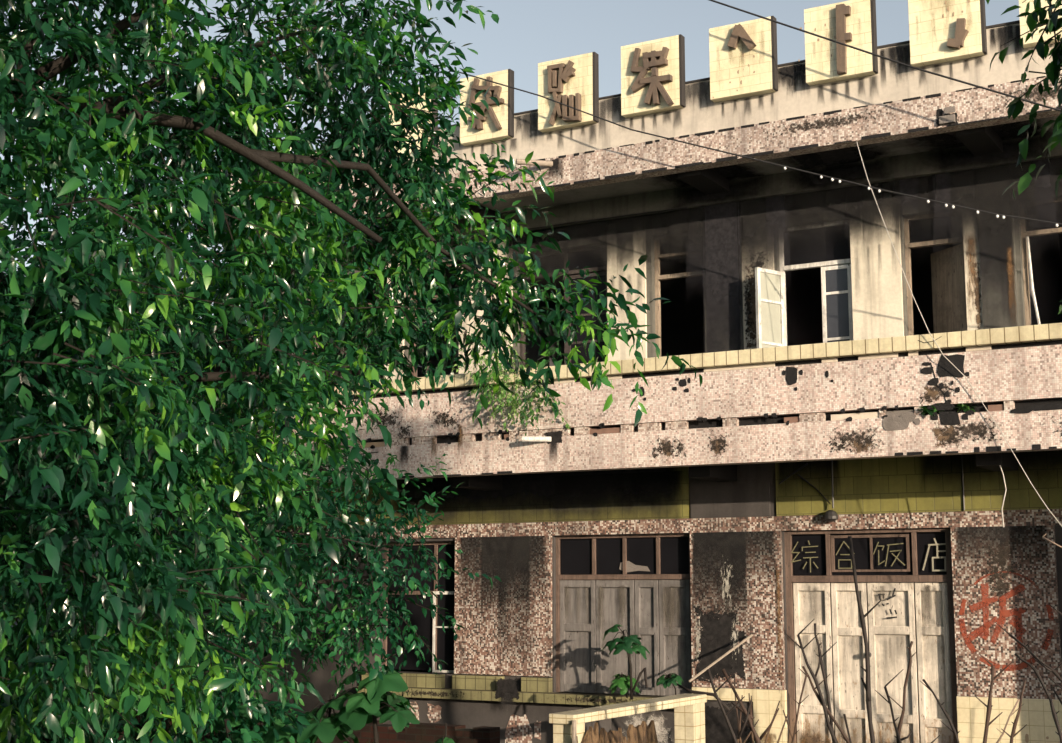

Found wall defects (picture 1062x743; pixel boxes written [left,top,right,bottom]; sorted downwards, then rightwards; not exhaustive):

water stain [778,45,982,96]
water stain [750,108,894,139]
water stain [507,120,1062,353]
spalling [782,367,803,391]
spalling [882,354,974,431]
water stain [397,435,686,521]
water stain [779,425,881,482]
water stain [923,414,1004,478]
water stain [1018,450,1062,476]
water stain [460,536,545,610]
water stain [693,531,775,658]
spalling [694,604,749,683]